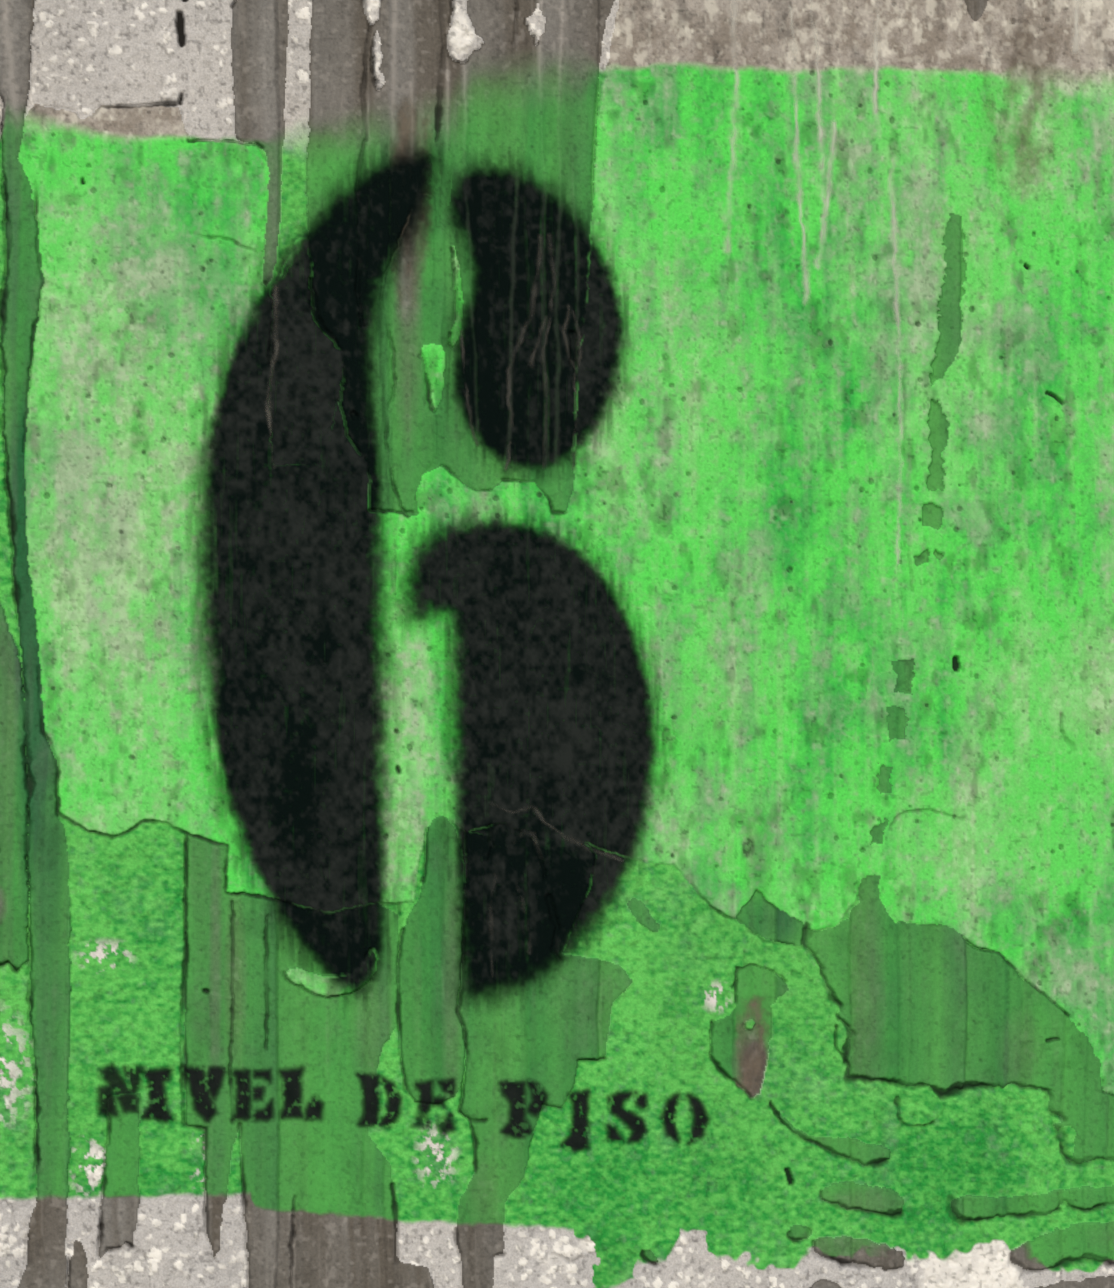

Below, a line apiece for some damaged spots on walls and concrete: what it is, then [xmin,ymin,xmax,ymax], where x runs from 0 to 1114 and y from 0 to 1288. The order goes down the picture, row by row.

peeling [964,0,988,21]
peeling [187,0,289,290]
peeling [305,0,615,518]
peeling [0,0,141,1288]
spalling [952,656,960,672]
peeling [179,816,632,1288]
peeling [709,964,904,1219]
peeling [736,874,1114,1169]
peeling [810,1279,841,1288]
peeling [786,1225,905,1276]
peeling [945,1185,1114,1288]